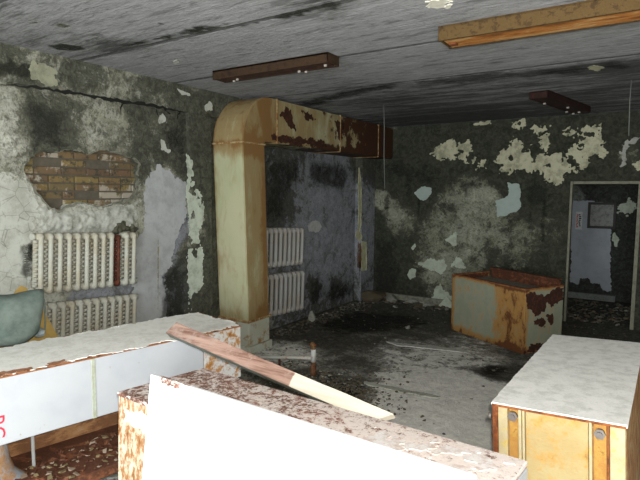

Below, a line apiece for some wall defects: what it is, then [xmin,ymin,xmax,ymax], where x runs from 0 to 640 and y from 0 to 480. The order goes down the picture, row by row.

water stain [276,2,339,19]
water stain [180,24,226,34]
water stain [0,59,34,81]
peeling [29,61,58,87]
water stain [419,61,627,86]
crack [5,84,183,119]
corrosion [271,106,327,149]
peeling [430,138,487,170]
peeling [494,118,609,217]
peeling [414,186,432,201]
flaking render [0,148,205,323]
water stain [164,267,184,317]